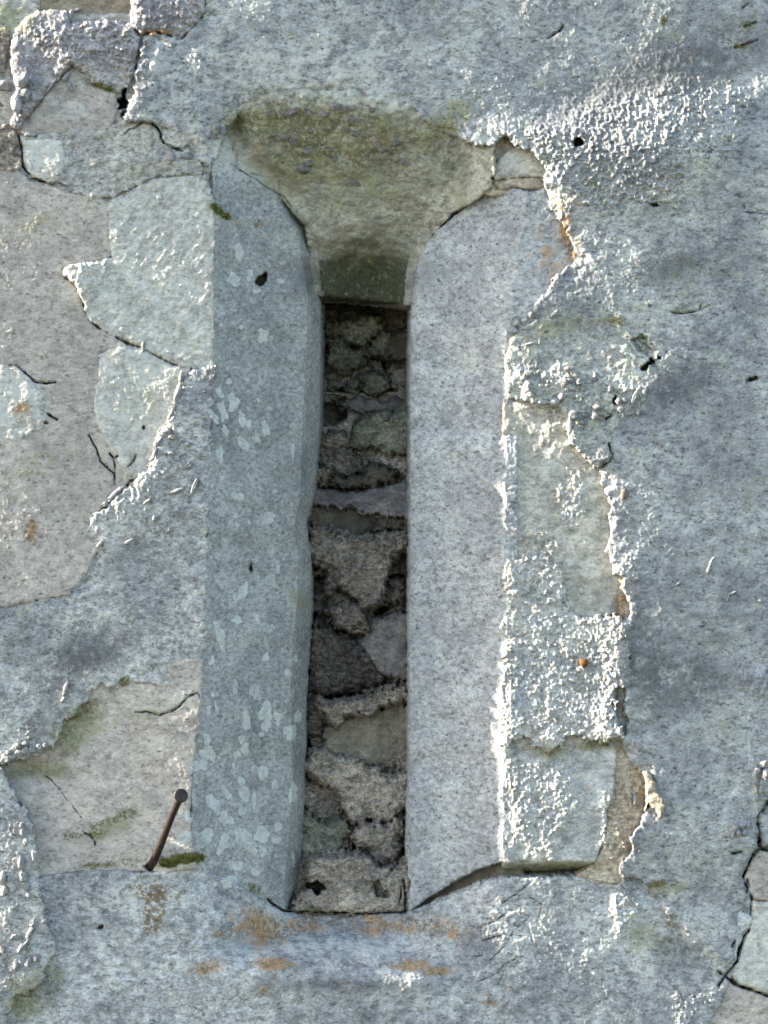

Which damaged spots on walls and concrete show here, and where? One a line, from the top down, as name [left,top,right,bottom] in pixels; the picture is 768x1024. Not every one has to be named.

spalling [0,0,206,137]
crack [126,122,183,152]
spalling [166,144,211,183]
water stain [261,102,411,167]
peeling [152,370,192,460]
peeling [101,486,124,507]
peeling [170,461,198,496]
spalling [499,366,667,886]
crack [731,800,768,893]
crack [718,930,768,996]